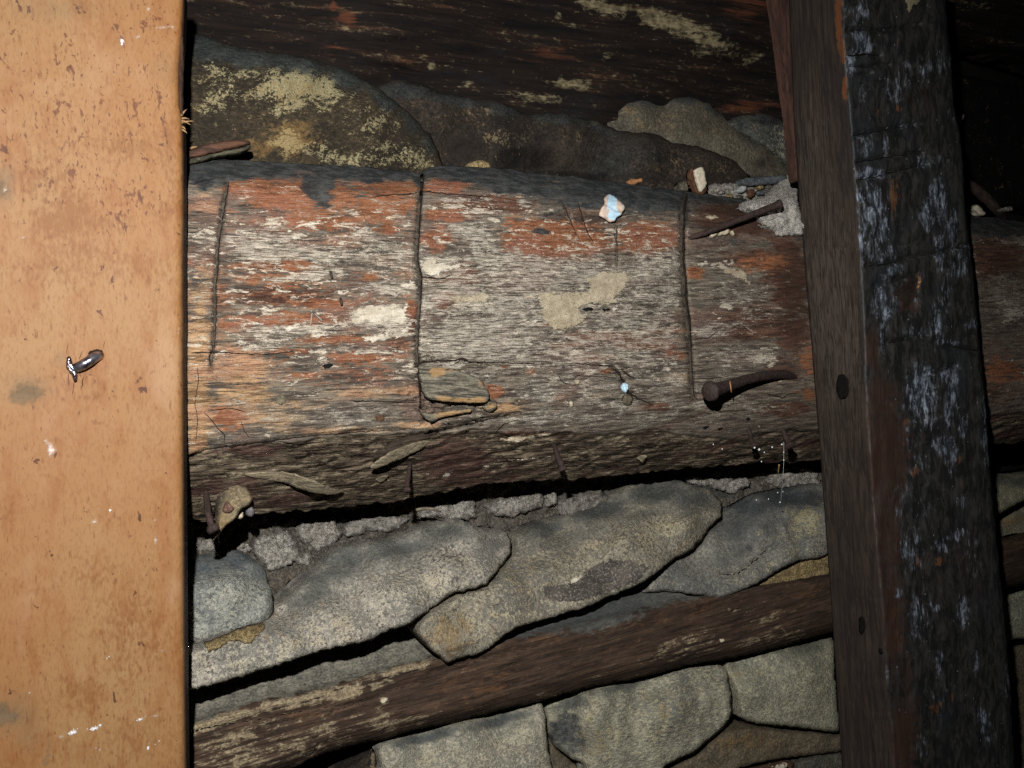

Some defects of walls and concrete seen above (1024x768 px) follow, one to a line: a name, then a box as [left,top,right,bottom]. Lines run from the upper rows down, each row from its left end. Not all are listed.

peeling [686,167,707,195]
peeling [598,194,625,223]
peeling [420,259,461,275]
flaking render [526,269,630,331]
peeling [350,303,410,343]
peeling [500,433,551,443]